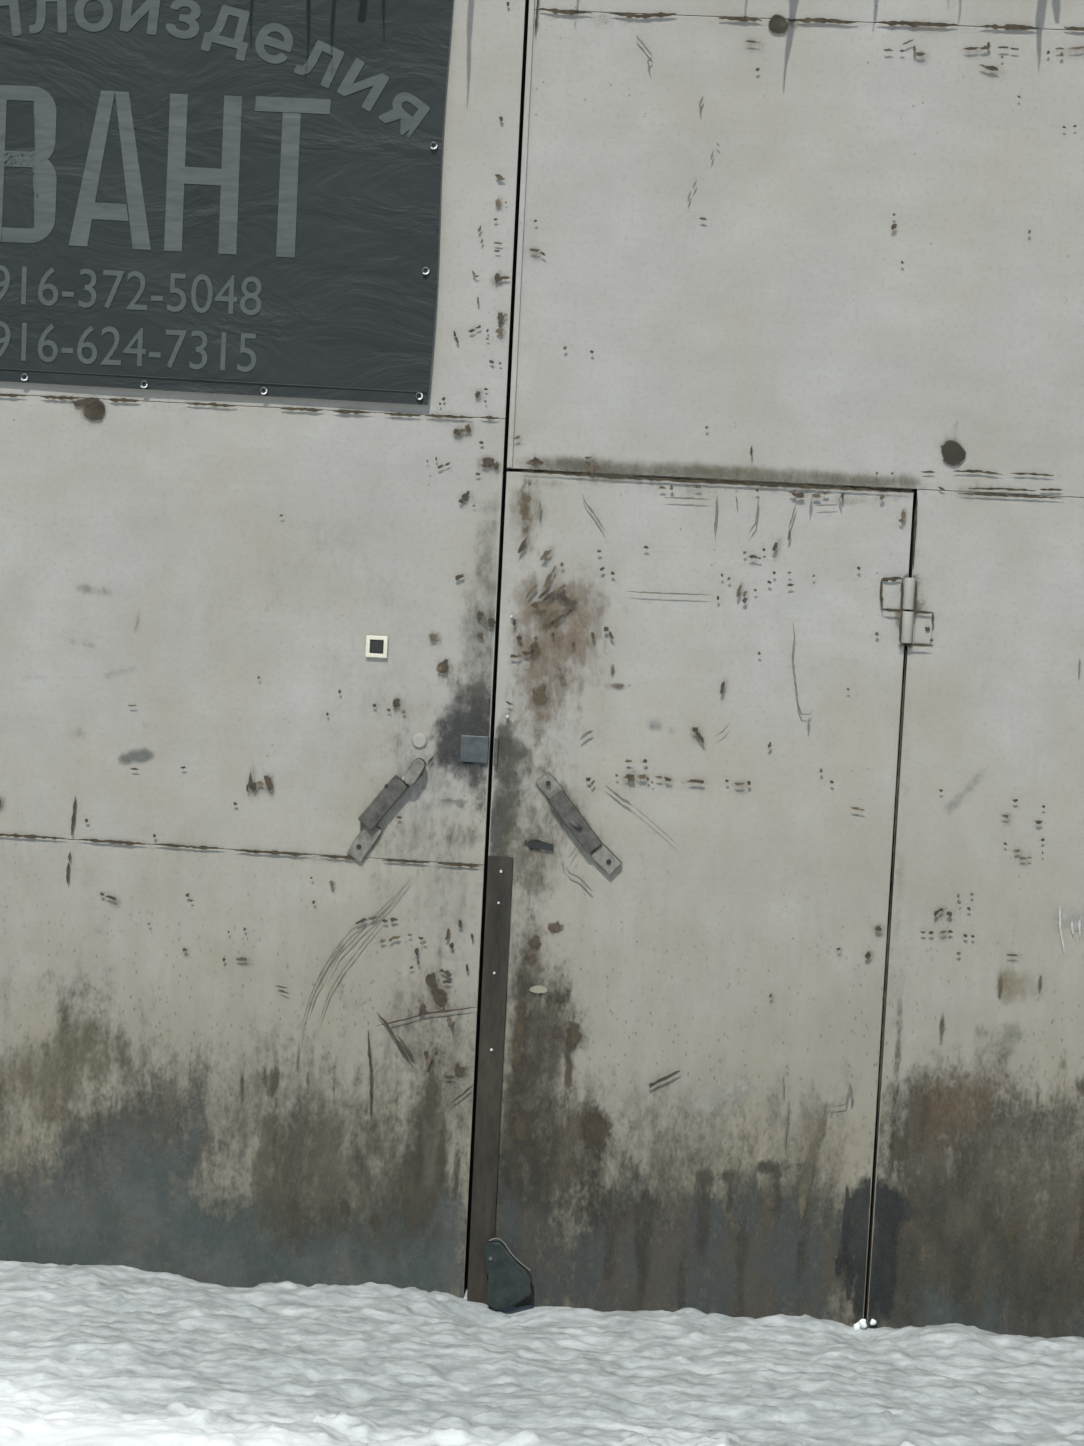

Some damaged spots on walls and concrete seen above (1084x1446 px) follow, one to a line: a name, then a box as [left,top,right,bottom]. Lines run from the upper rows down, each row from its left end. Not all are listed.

corrosion [535,0,592,34]
corrosion [718,14,858,33]
leakage [0,1069,467,1298]
leakage [495,1150,1084,1339]